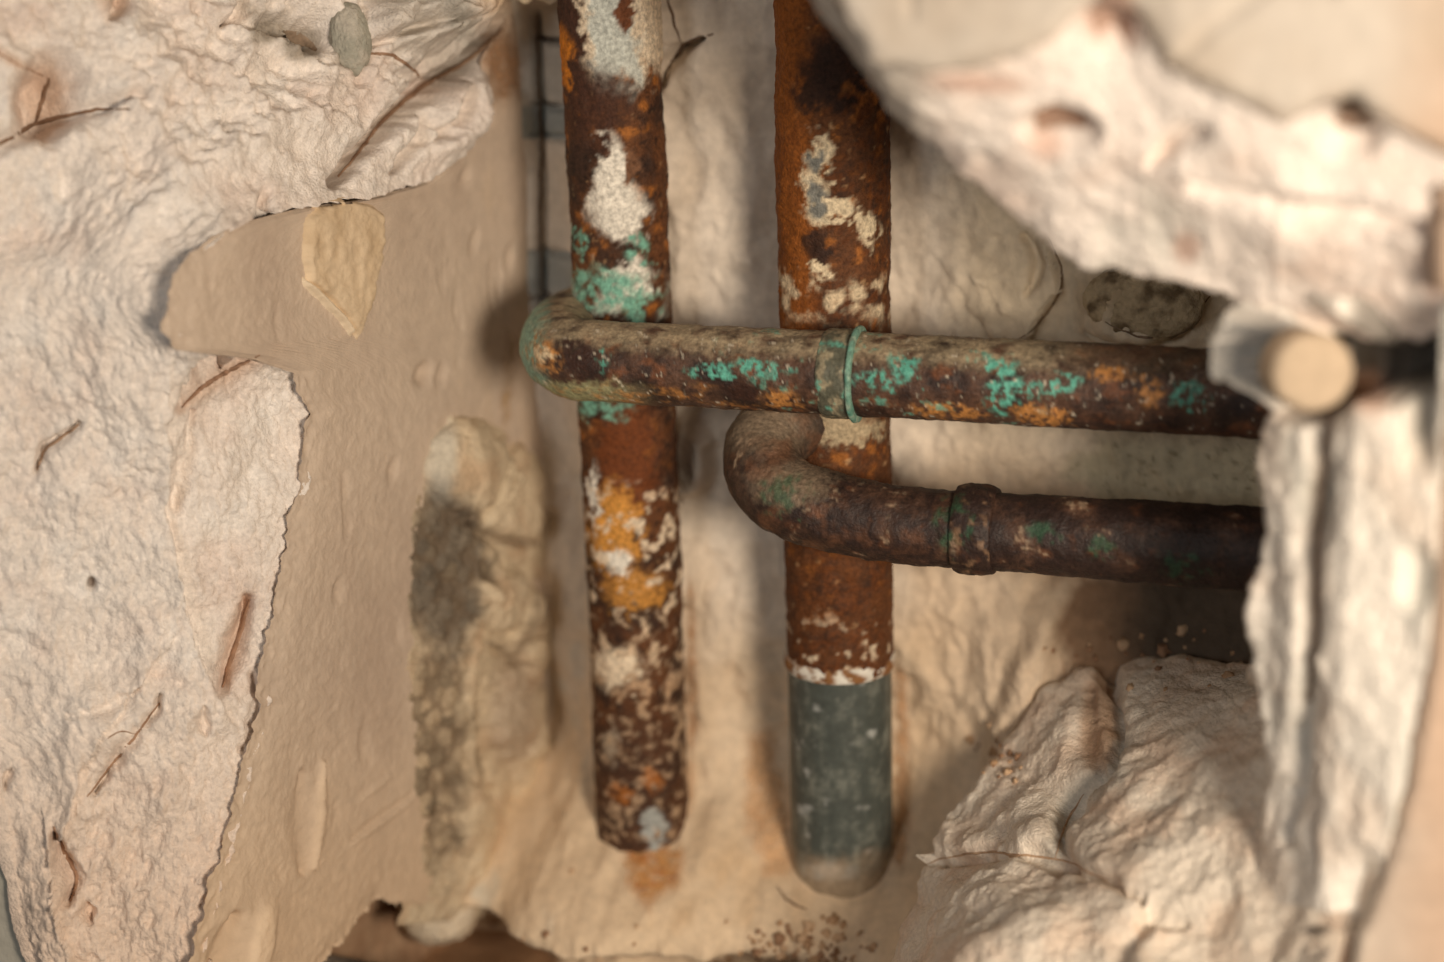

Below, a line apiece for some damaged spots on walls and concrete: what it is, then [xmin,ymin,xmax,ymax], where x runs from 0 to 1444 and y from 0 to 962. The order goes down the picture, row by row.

crack [0,53,129,145]
crack [222,599,250,688]
flaking render [0,0,515,962]
spalling [397,415,552,925]
flaking render [813,0,1444,962]